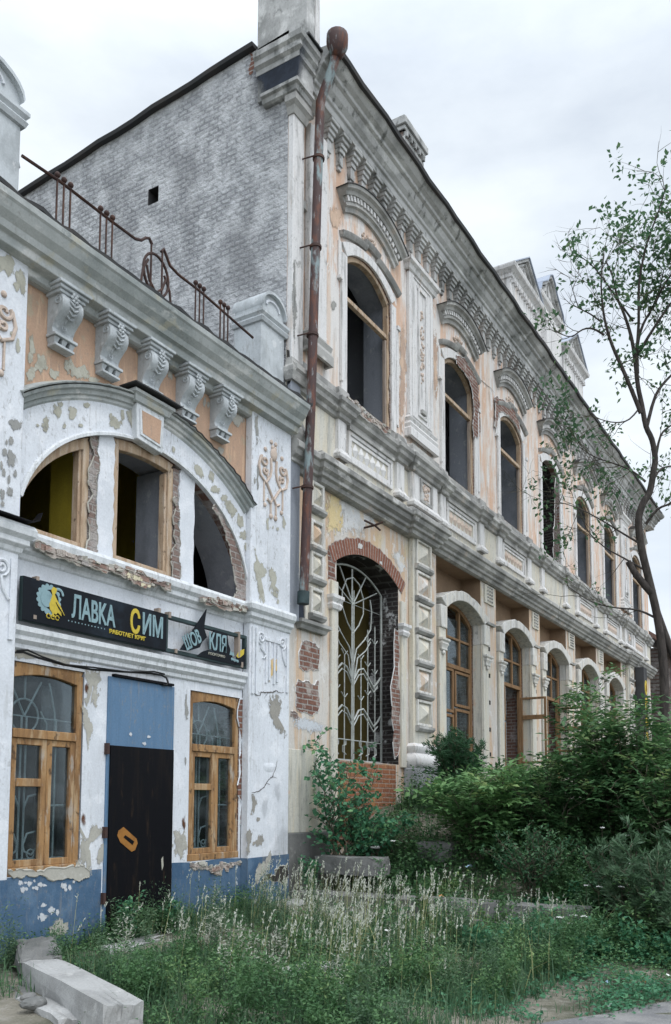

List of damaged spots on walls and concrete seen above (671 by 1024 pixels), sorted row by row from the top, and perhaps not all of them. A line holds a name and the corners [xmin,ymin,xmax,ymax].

peeling [10,329,99,382]
peeling [0,419,23,507]
flaking render [33,401,182,592]
flaking render [194,464,279,613]
flaking render [268,640,326,738]
flaking render [172,698,289,886]
flaking render [8,824,104,893]